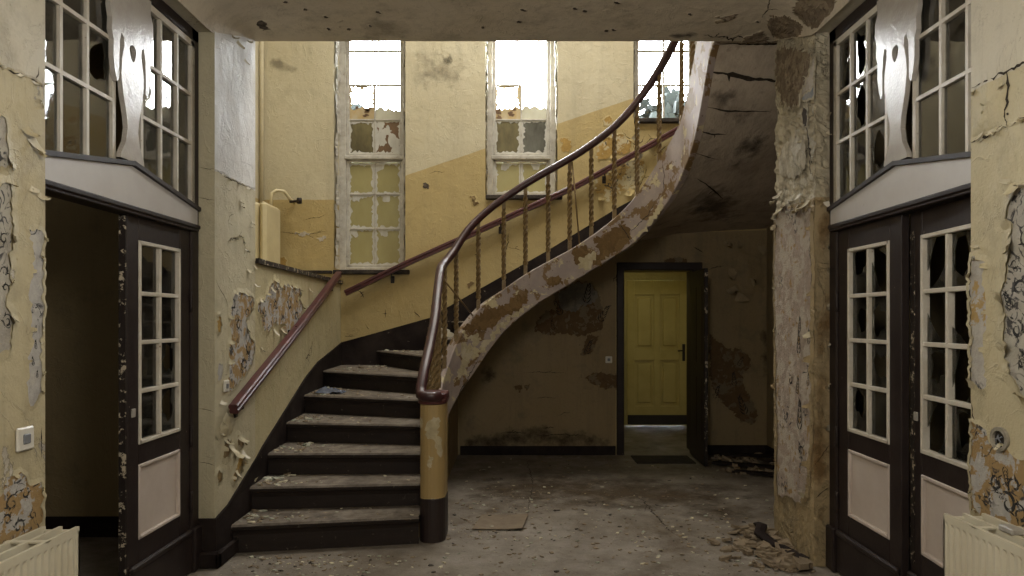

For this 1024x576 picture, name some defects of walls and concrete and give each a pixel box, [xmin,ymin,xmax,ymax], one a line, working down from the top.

peeling [468,41,573,208]
peeling [593,115,647,204]
crack [696,107,769,199]
crack [713,72,776,82]
flaking render [741,0,837,129]
crack [970,61,1024,143]
peeling [0,107,49,411]
peeling [215,256,309,405]
peeling [457,200,664,379]
peeling [966,172,1024,413]
peeling [0,466,47,544]
peeling [967,417,1024,527]